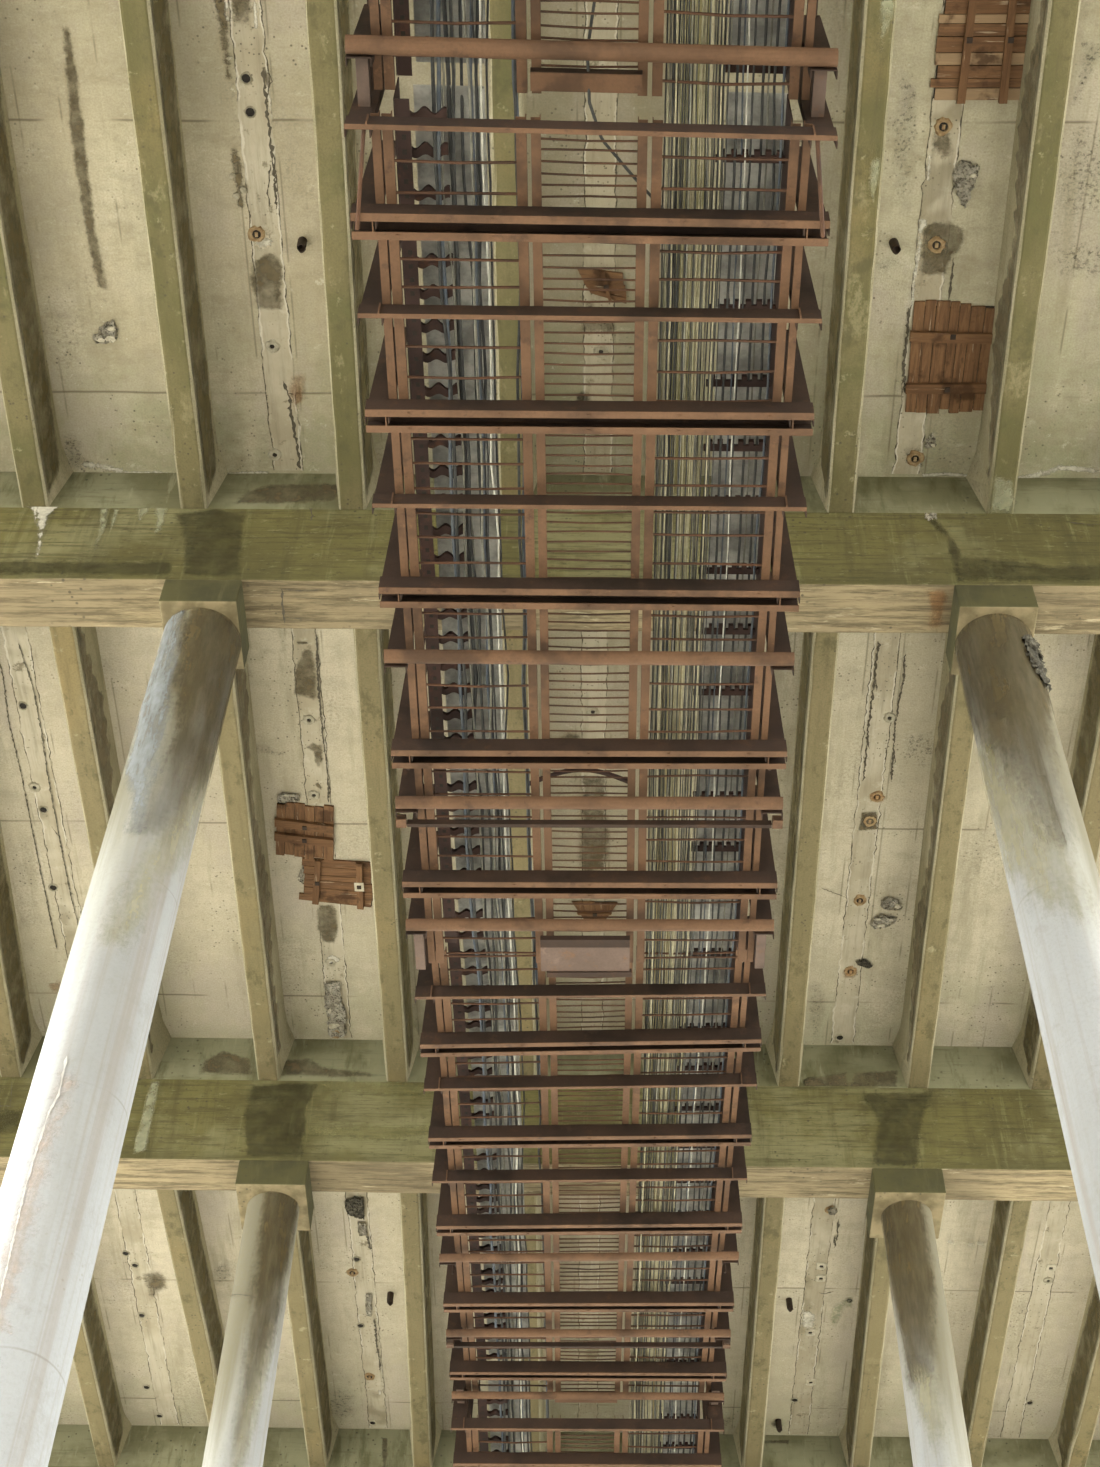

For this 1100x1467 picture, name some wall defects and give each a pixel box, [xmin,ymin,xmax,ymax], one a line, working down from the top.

spalling [92,320,118,344]
leakage [0,0,337,575]
crack [261,67,278,210]
spalling [952,160,980,208]
leakage [987,0,1100,511]
crack [283,381,301,469]
crack [862,642,906,782]
spalling [1021,634,1052,692]
crack [0,643,78,948]
leakage [125,607,369,1155]
leakage [804,613,1052,1165]
spalling [345,1196,368,1237]